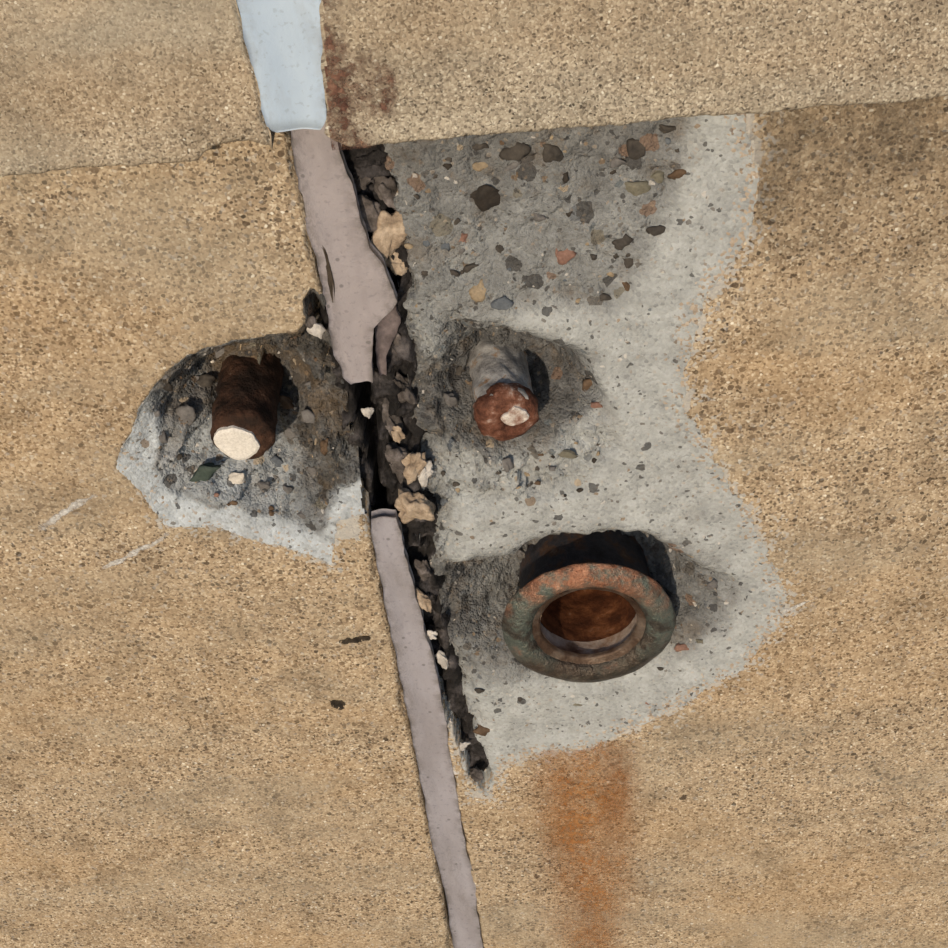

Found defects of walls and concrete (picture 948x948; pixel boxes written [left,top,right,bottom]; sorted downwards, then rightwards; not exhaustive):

spalling [116,288,368,565]
crack [319,144,489,782]
spalling [383,113,805,796]